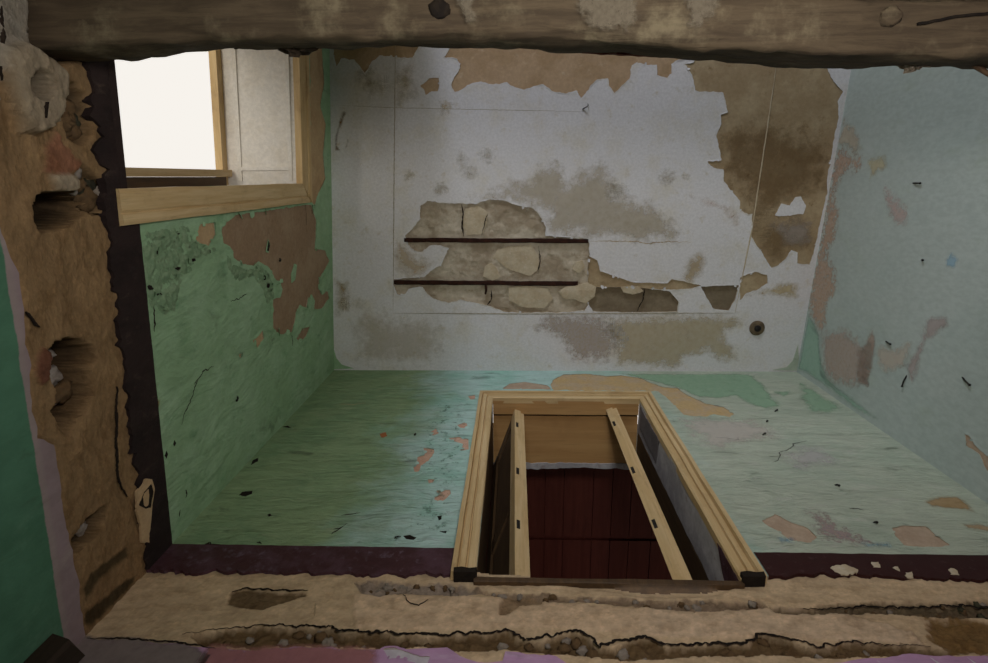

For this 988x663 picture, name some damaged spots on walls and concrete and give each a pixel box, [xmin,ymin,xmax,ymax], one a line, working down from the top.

flaking render [0,0,30,73]
flaking render [332,45,420,75]
crack [917,12,988,25]
flaking render [392,48,845,315]
peeling [192,202,330,344]
flaking render [0,61,155,636]
peeling [502,373,736,418]
peeling [640,407,659,463]
spalling [831,564,858,576]
crack [90,587,930,648]
flaking render [86,571,988,663]
crack [803,603,988,611]